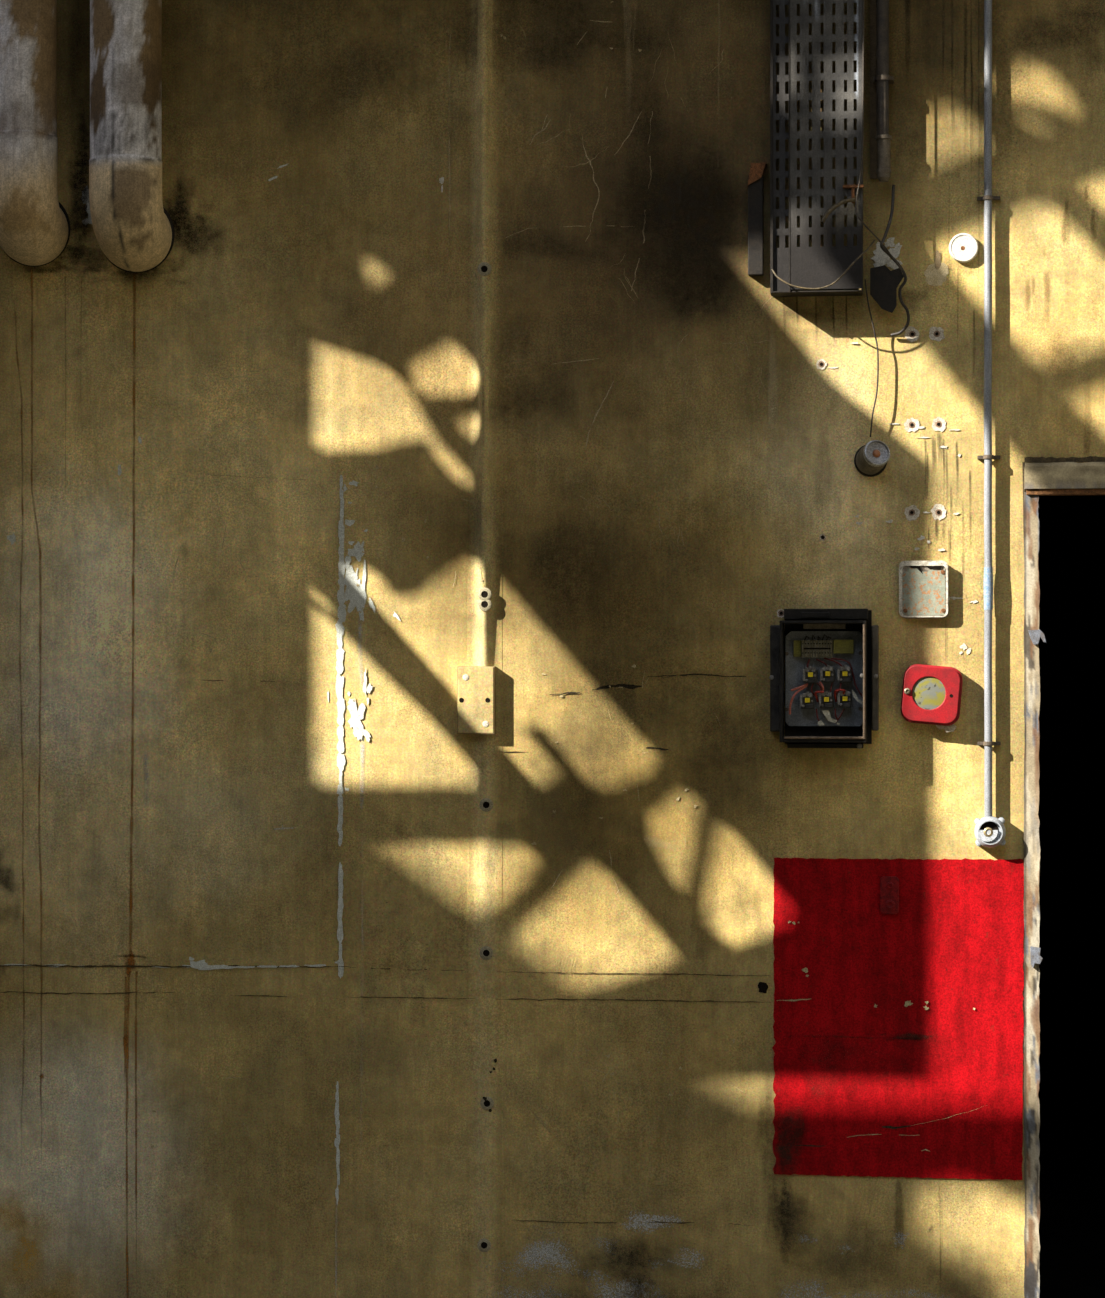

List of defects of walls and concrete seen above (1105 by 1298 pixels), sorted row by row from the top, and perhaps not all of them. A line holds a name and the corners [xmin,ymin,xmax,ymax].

crack [530,39,688,303]
rust [21,376,41,605]
rust [121,381,146,1203]
peeling [155,863,344,979]
peeling [327,475,375,846]
spalling [758,982,809,1001]